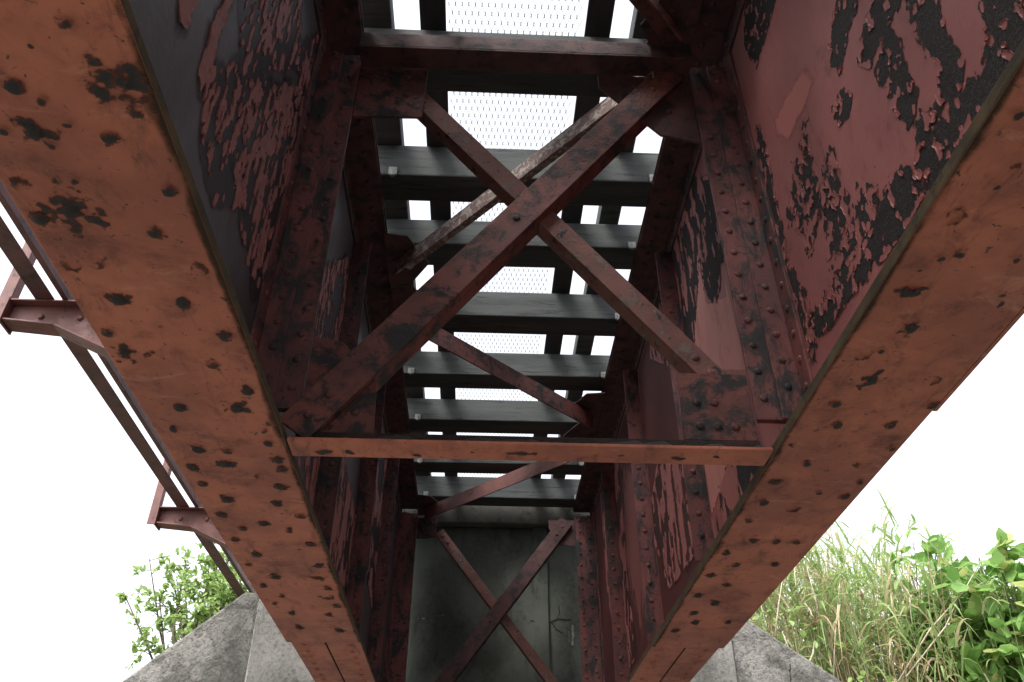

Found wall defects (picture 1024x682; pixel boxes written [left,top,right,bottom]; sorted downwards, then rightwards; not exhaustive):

peeling [743,0,776,70]
corrosion [84,54,152,118]
corrosion [0,116,72,150]
corrosion [27,178,110,239]
peeling [197,0,319,303]
peeling [754,0,1024,366]
peeling [672,174,724,344]
corrosion [104,293,132,305]
corrosion [101,328,155,364]
corrosion [220,385,254,413]
peeling [329,457,356,590]
peeling [651,464,695,589]